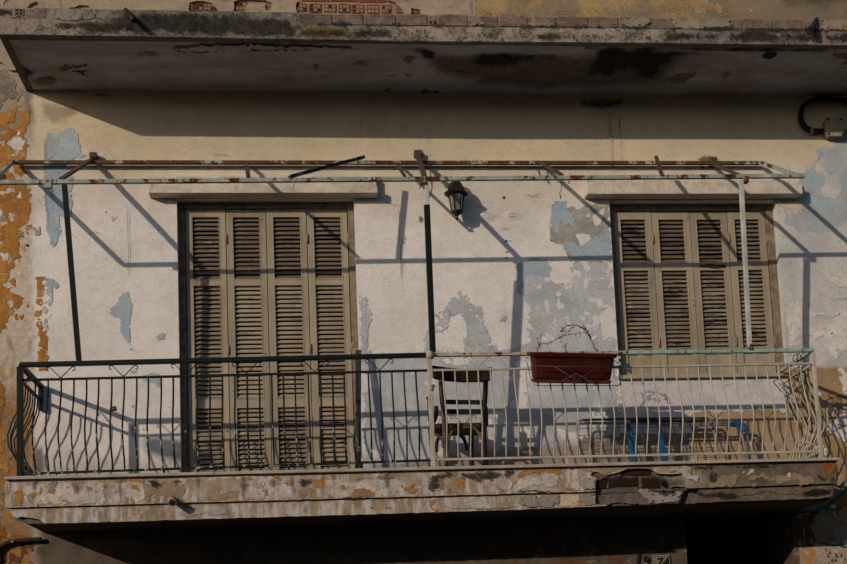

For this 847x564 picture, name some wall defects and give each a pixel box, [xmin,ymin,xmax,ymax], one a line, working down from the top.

spalling [234,0,271,12]
spalling [296,0,681,29]
damp [481,9,614,40]
damp [418,25,847,87]
peeling [777,138,847,234]
peeling [0,69,85,371]
peeling [110,292,134,360]
peeling [359,201,835,510]
peeling [787,300,847,394]
peeling [821,407,847,441]
peeling [12,478,145,506]
peeling [170,475,438,511]